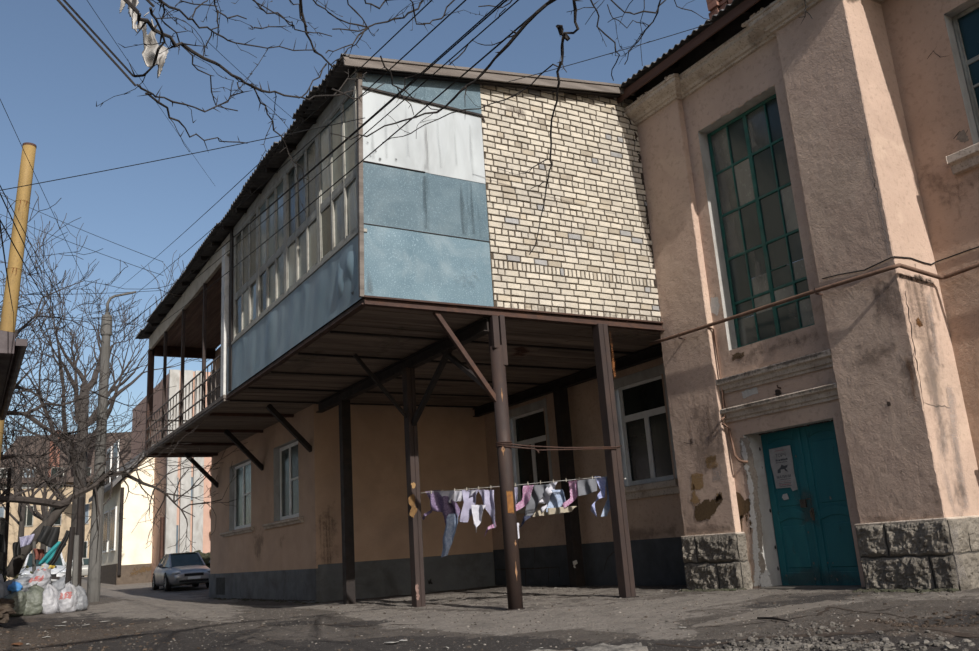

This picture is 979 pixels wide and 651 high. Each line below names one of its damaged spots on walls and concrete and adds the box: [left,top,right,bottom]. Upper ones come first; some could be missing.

crack [865,137,888,242]
crack [905,291,950,408]
corrosion [506,490,514,513]
peeling [690,490,723,521]
peeling [736,420,833,587]
leakage [947,389,967,506]